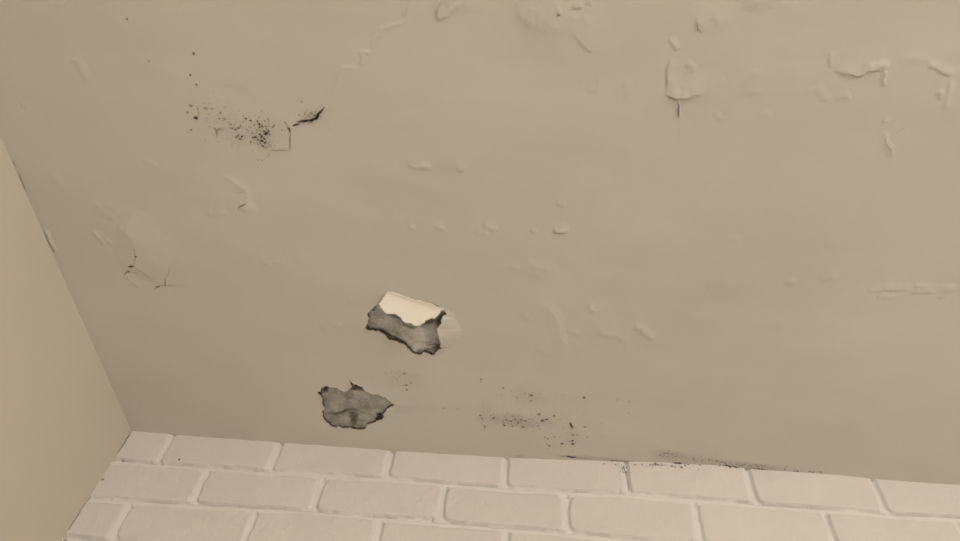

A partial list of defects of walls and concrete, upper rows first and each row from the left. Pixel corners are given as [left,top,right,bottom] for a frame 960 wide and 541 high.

peeling [364,291,462,357]
flaking render [317,380,394,430]